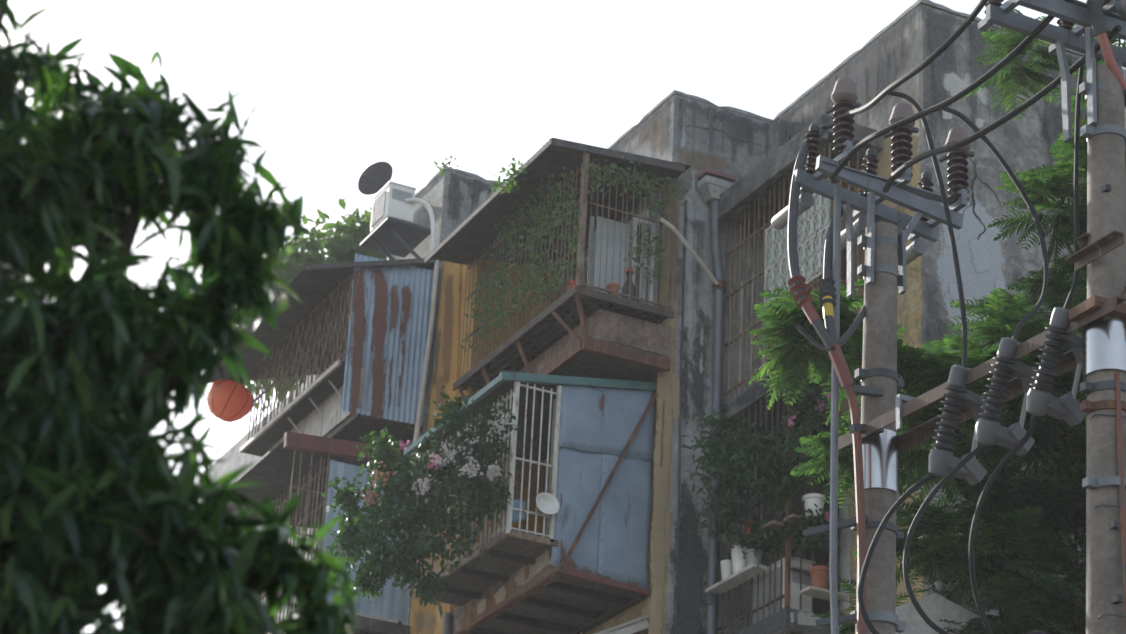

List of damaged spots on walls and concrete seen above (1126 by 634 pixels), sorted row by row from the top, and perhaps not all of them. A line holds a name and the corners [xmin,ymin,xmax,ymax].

leakage [612,13,913,169]
leakage [929,9,1087,166]
corrosion [350,267,413,420]
leakage [663,193,710,431]
leakage [668,467,708,634]